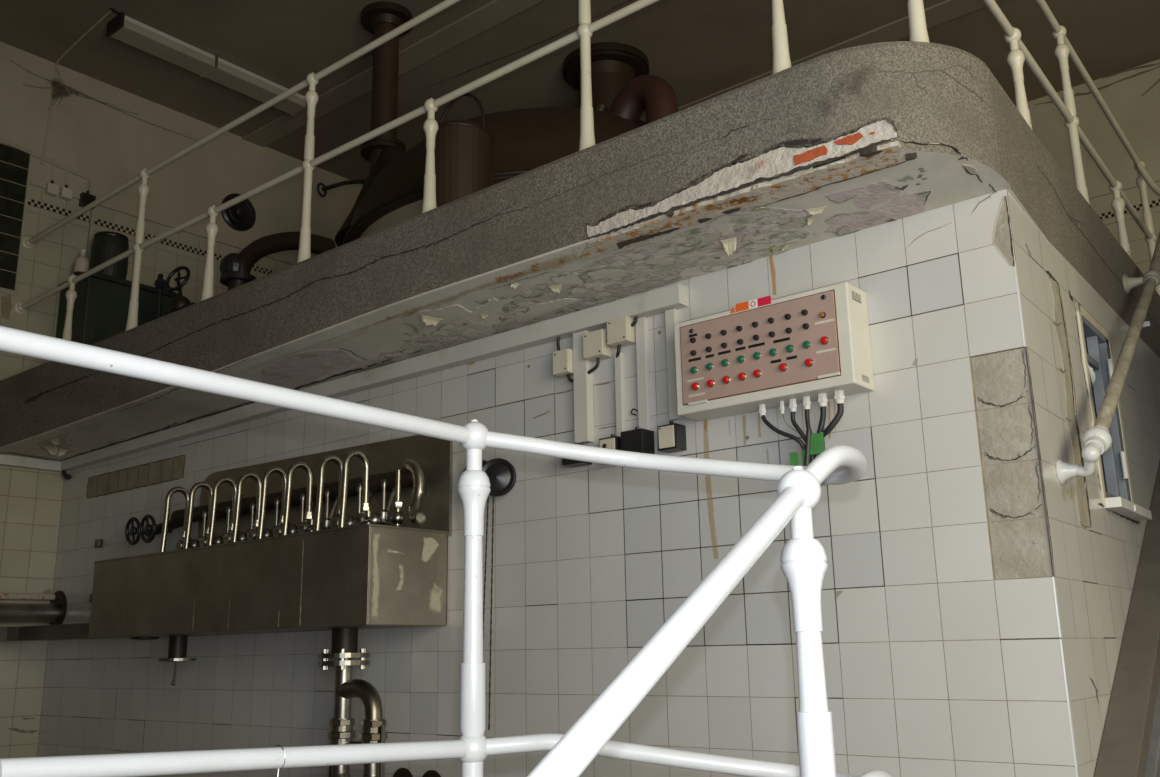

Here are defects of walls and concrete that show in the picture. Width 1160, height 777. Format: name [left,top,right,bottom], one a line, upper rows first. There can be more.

crack [141,151,674,356]
peeling [260,168,931,389]
corrosion [488,141,917,290]
crack [701,117,779,144]
spalling [586,117,898,239]
crack [885,65,991,107]